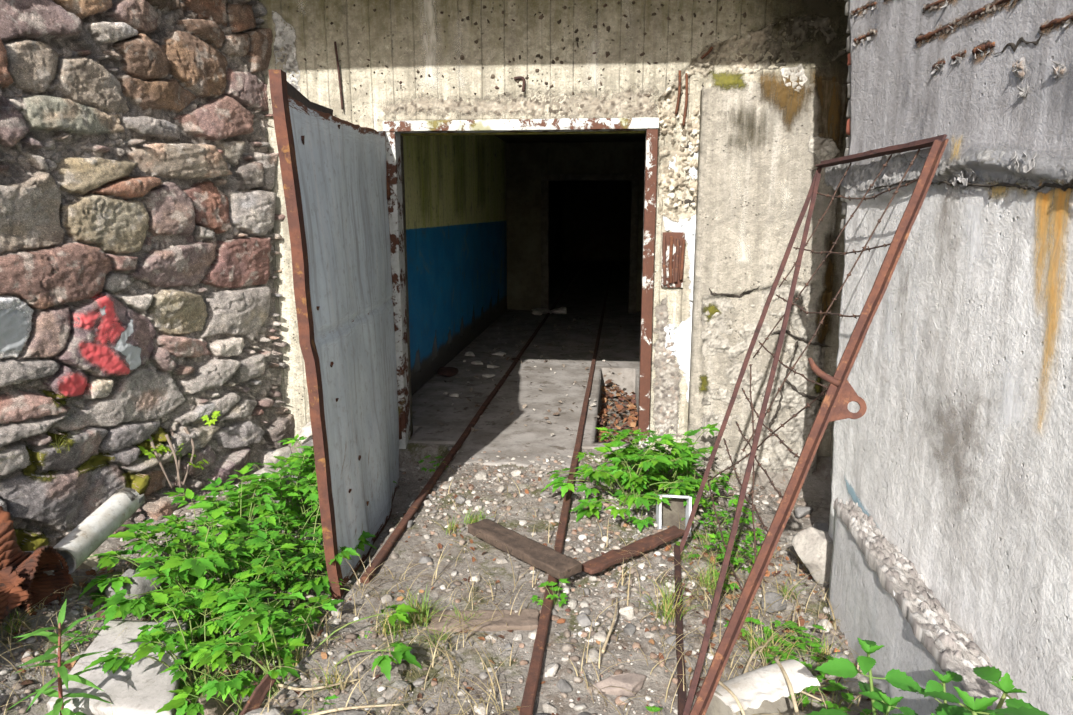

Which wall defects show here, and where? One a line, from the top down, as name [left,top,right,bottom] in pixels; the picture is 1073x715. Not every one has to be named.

spalling [850,0,887,17]
spalling [915,0,1019,46]
spalling [1039,13,1073,32]
damp [769,0,850,108]
spalling [931,40,995,74]
crack [994,32,1043,55]
spalling [1012,56,1030,98]
crack [869,177,1073,200]
spalling [382,1,877,474]
crack [709,286,760,298]
rust [1024,183,1071,373]